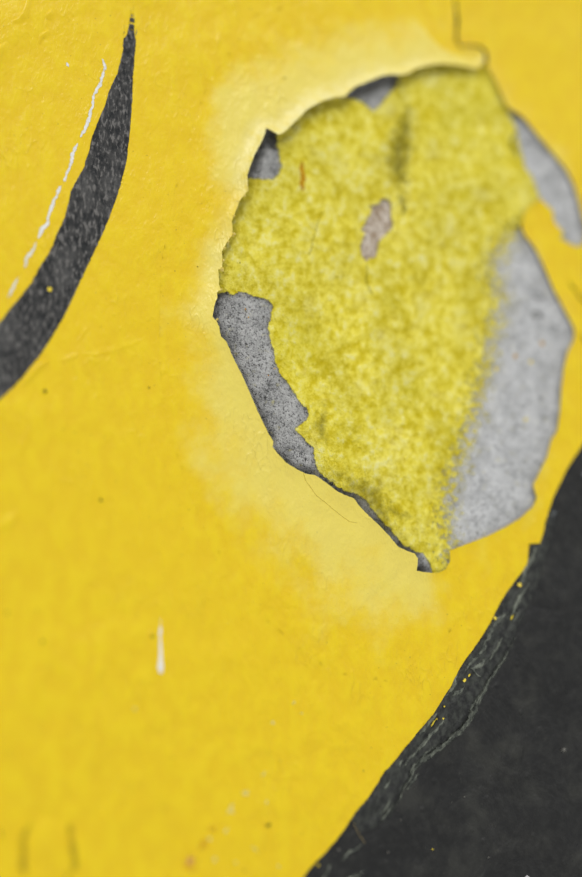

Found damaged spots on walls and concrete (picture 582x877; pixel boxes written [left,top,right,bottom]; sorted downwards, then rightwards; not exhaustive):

peeling [158,0,582,831]